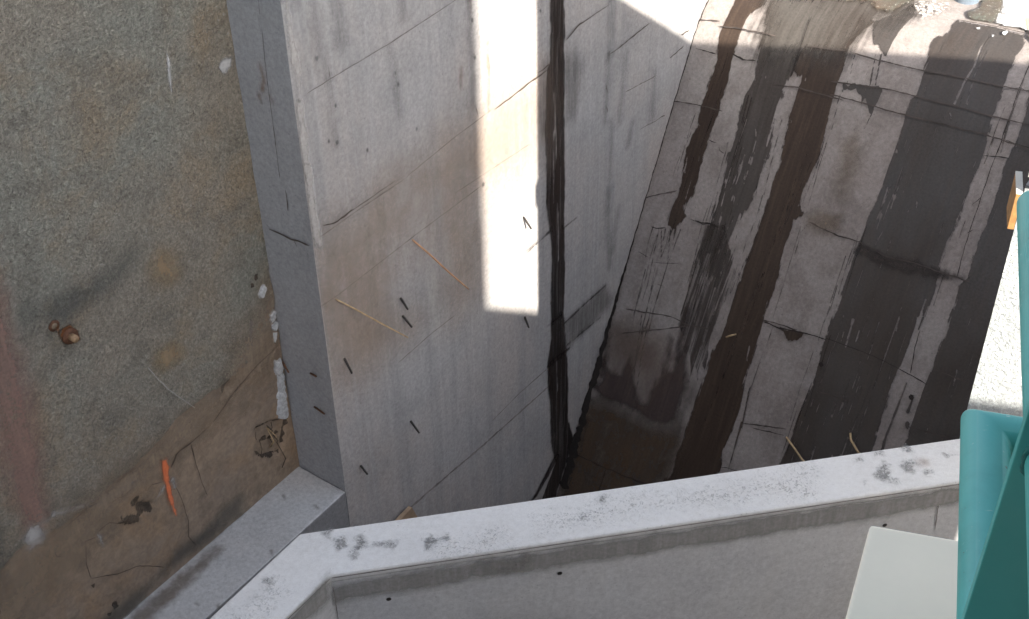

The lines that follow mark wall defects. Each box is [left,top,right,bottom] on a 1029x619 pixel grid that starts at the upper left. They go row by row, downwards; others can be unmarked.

damp [531,0,609,501]
damp [593,0,949,481]
damp [779,0,1029,465]